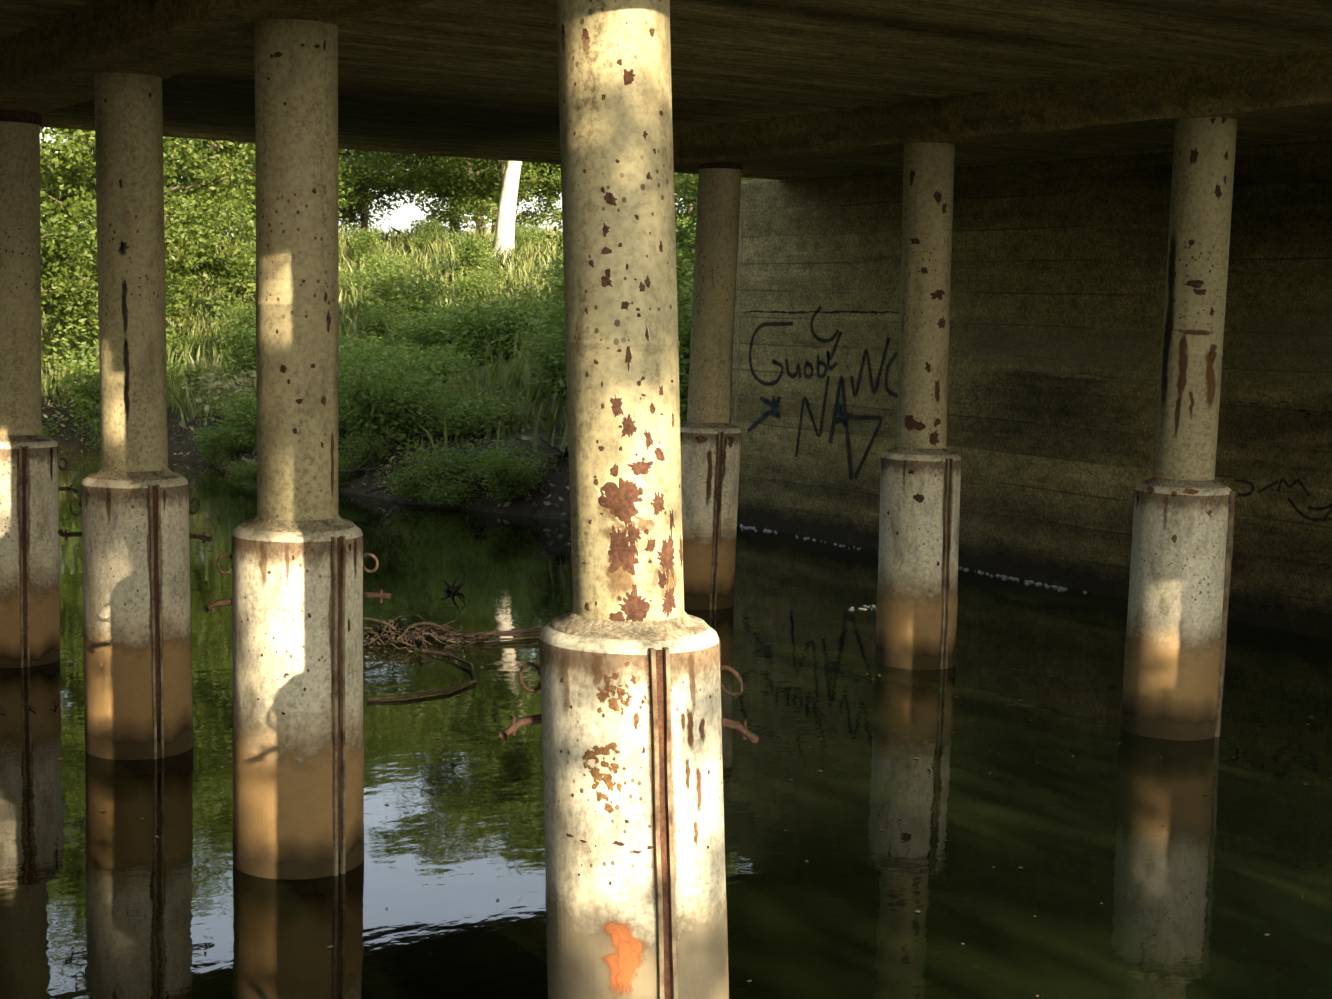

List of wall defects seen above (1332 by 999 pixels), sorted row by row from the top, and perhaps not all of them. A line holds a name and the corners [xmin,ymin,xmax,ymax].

rust [904,415,941,432]
rust [1175,330,1217,434]
leakage [0,577,60,668]
leakage [83,500,193,760]
rust [603,507,652,591]
leakage [682,439,879,610]
leakage [942,471,1130,600]
leakage [1120,507,1332,741]
leakage [233,728,364,880]
rust [538,637,721,844]